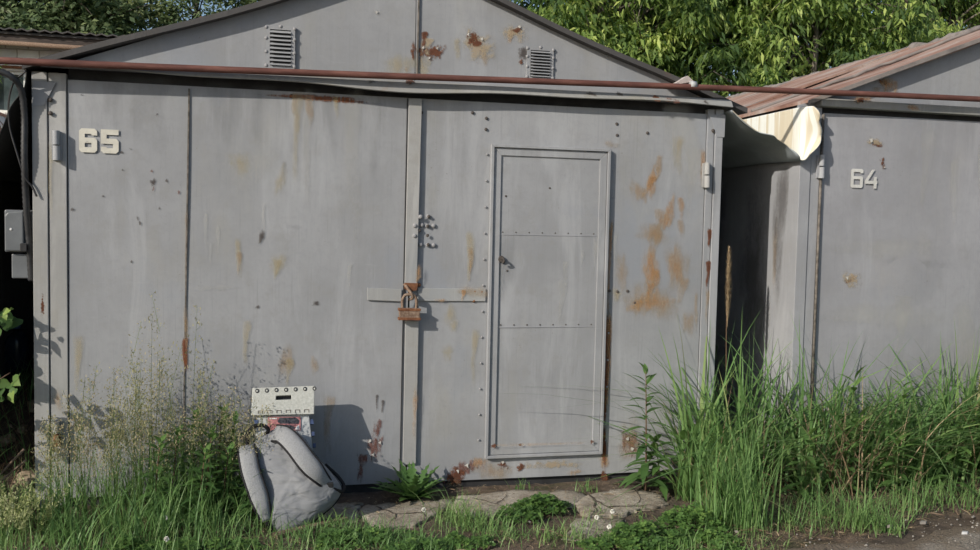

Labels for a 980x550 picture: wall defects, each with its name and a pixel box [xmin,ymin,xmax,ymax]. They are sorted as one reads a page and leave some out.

corrosion [416,32,445,60]
corrosion [271,94,363,103]
corrosion [591,318,611,481]
corrosion [443,459,482,484]
corrosion [498,461,577,471]